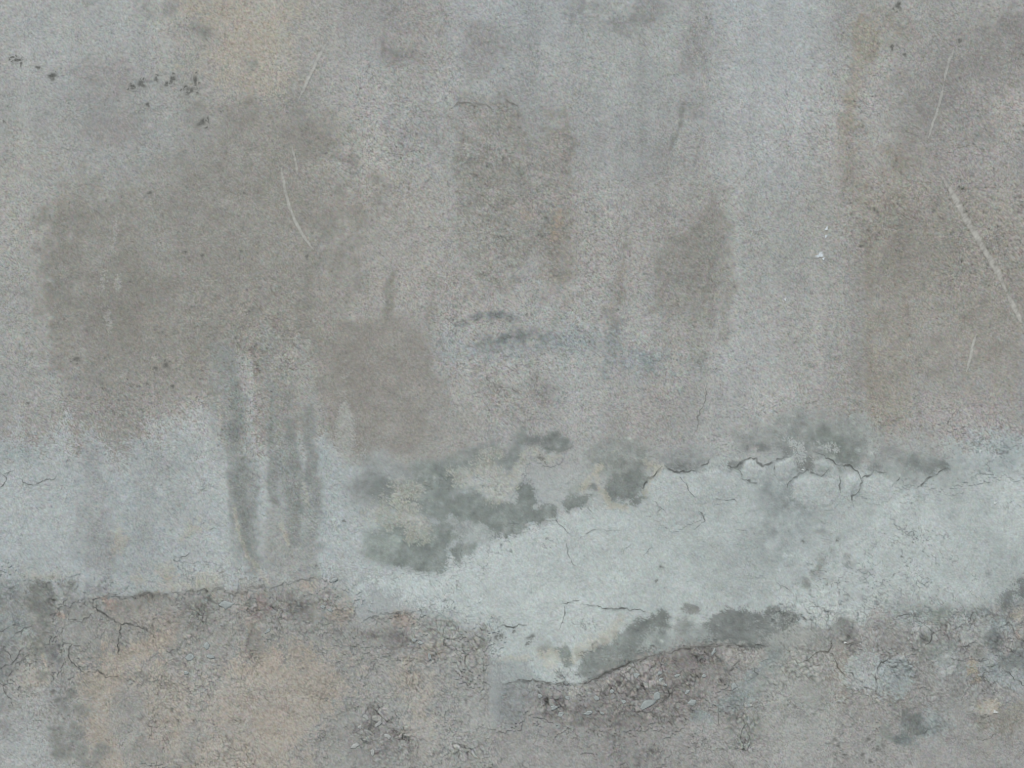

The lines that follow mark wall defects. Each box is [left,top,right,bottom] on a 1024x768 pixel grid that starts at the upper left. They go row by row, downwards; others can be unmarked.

damp [356,0,429,78]
crack [642,452,946,530]
damp [0,661,106,768]
crack [0,597,158,707]
flaking render [0,561,771,768]
damp [720,641,794,705]
flaking render [826,689,900,768]
damp [840,641,1024,768]